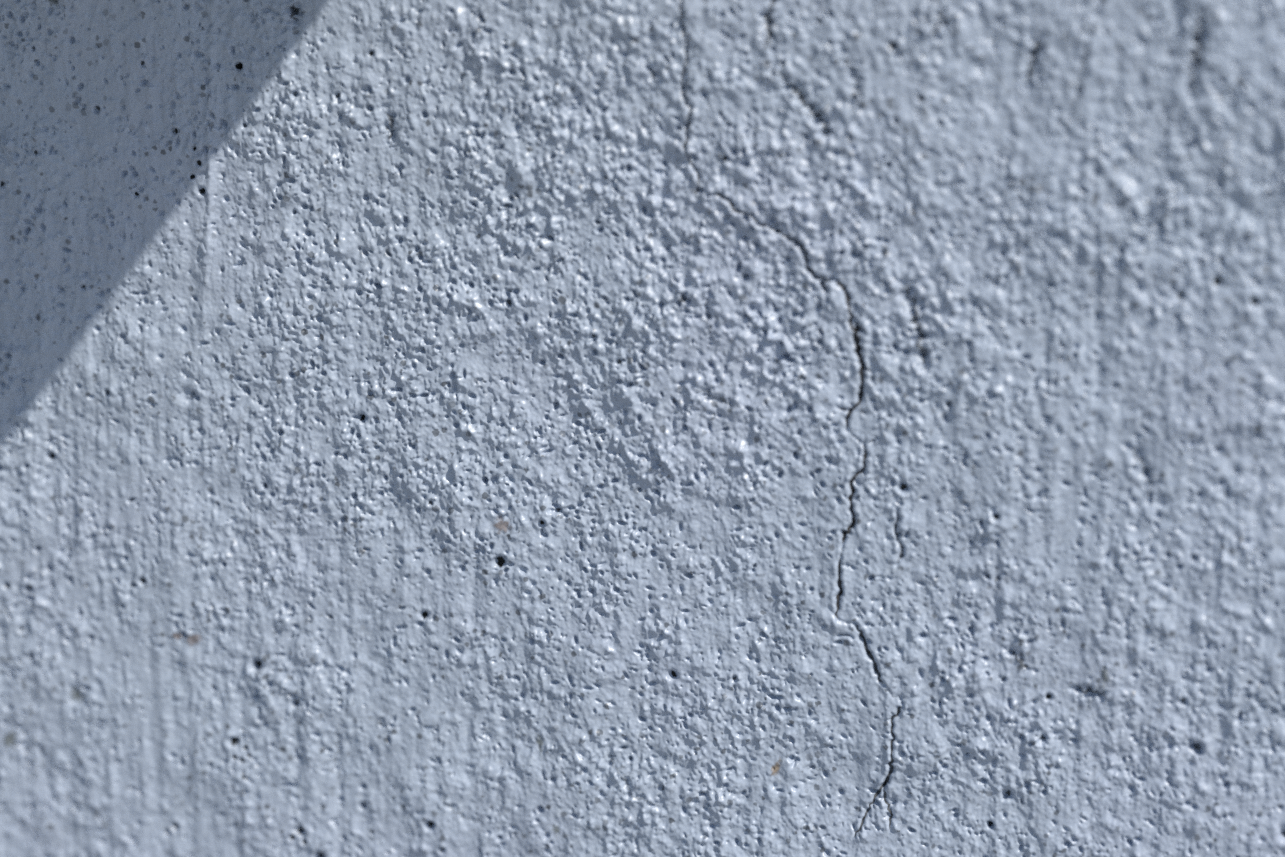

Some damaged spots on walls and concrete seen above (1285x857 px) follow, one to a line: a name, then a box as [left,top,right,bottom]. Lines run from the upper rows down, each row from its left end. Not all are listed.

crack [679,0,903,836]